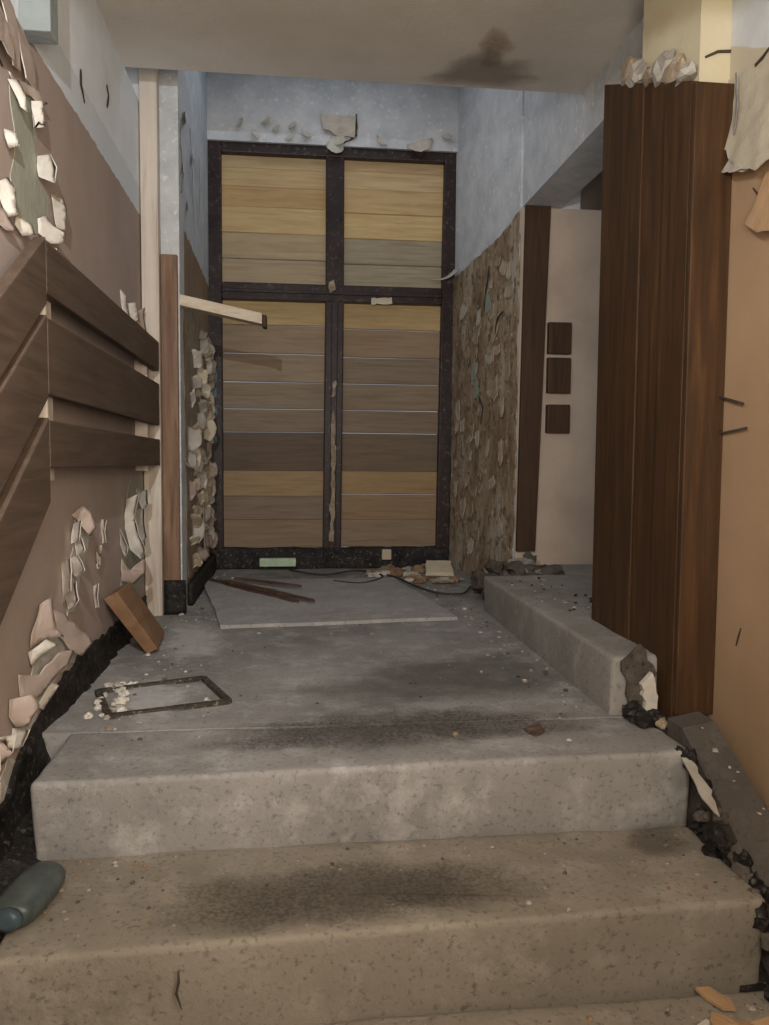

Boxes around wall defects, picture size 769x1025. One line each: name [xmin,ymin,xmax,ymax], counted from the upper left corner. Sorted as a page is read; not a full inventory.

peeling [0,0,67,250]
peeling [320,113,358,153]
peeling [407,133,452,152]
spalling [621,48,697,88]
peeling [722,53,769,233]
peeling [119,473,149,593]
peeling [182,309,218,580]
peeling [430,211,520,574]
peeling [0,505,107,804]
spalling [620,643,668,730]